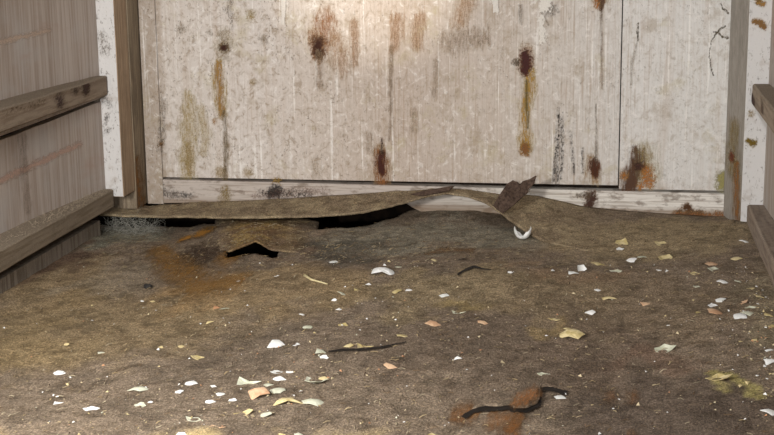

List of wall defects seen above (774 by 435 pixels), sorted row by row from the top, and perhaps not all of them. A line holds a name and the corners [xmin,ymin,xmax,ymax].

rust [308,9,337,62]
rust [513,47,536,157]
rust [373,138,390,185]
rust [576,150,600,207]
rust [620,144,655,191]
crack [461,373,568,419]